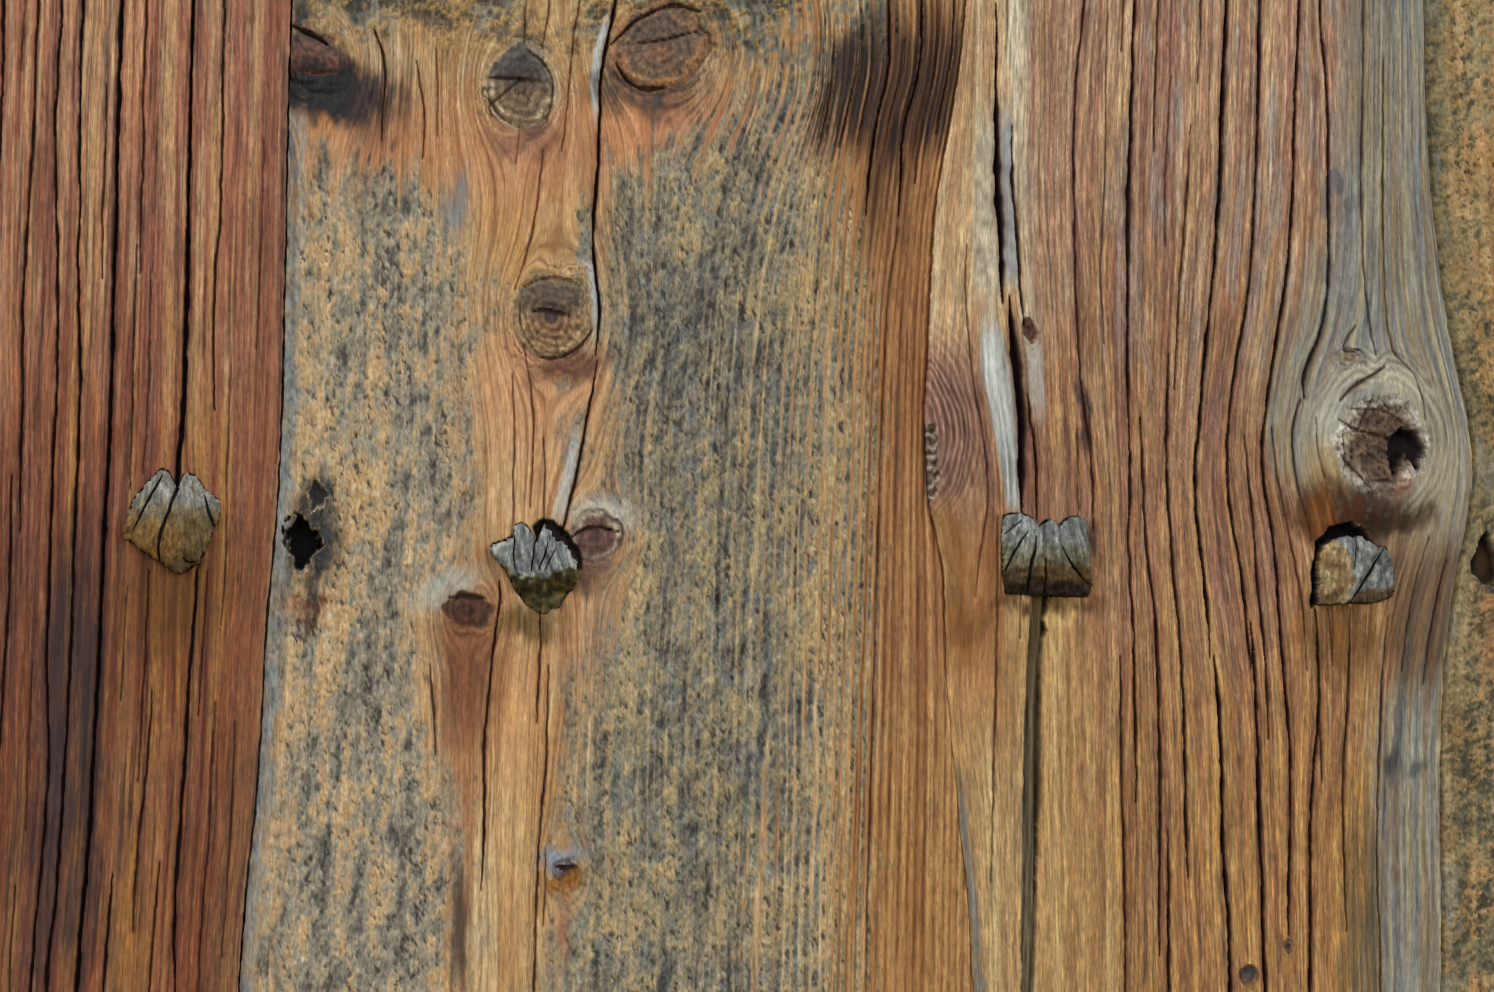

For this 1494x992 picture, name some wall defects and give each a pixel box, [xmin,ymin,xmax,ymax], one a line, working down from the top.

crack [532,612,576,992]
crack [449,0,702,891]
crack [816,0,957,992]
crack [964,0,1447,992]